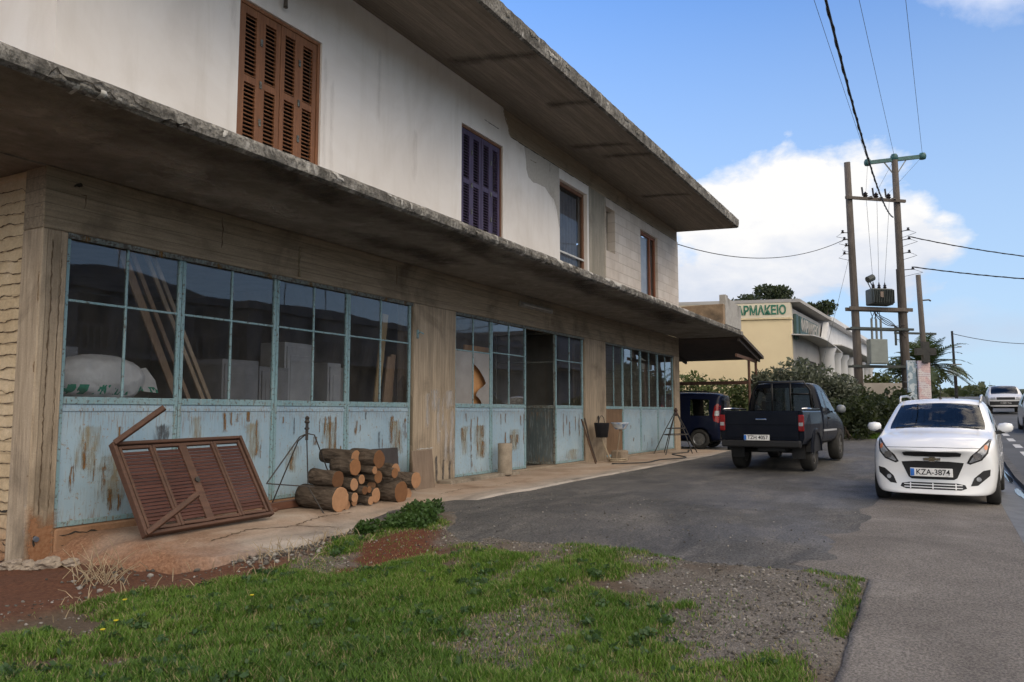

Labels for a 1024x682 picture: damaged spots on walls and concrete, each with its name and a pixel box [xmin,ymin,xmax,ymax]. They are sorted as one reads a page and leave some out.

peeling [525,147,560,225]
corrosion [223,412,261,458]
corrosion [313,416,341,449]
corrosion [461,417,486,459]
corrosion [69,427,121,511]
crack [211,512,352,541]